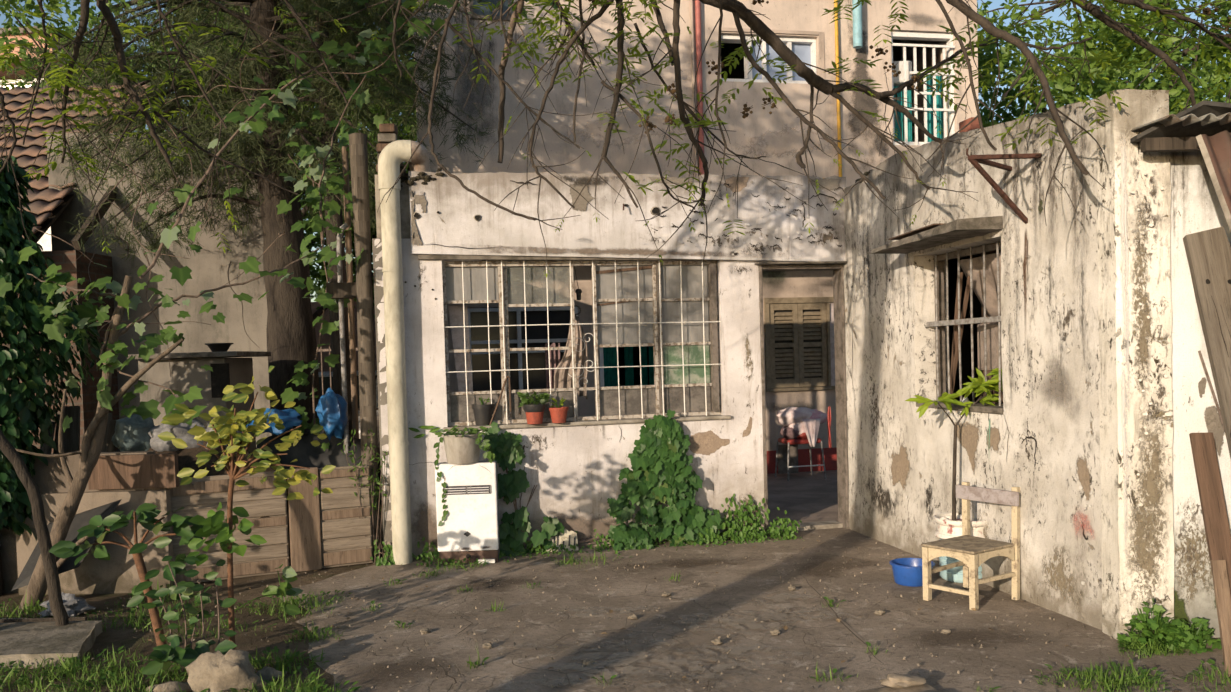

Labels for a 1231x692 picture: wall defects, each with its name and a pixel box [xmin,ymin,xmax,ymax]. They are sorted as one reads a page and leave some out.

spalling [410,190,427,246]
peeling [683,228,782,274]
peeling [775,205,844,248]
peeling [689,412,753,459]
peeling [864,369,910,499]
peeling [948,413,1004,482]
damp [866,479,895,517]
peeling [1074,458,1093,509]